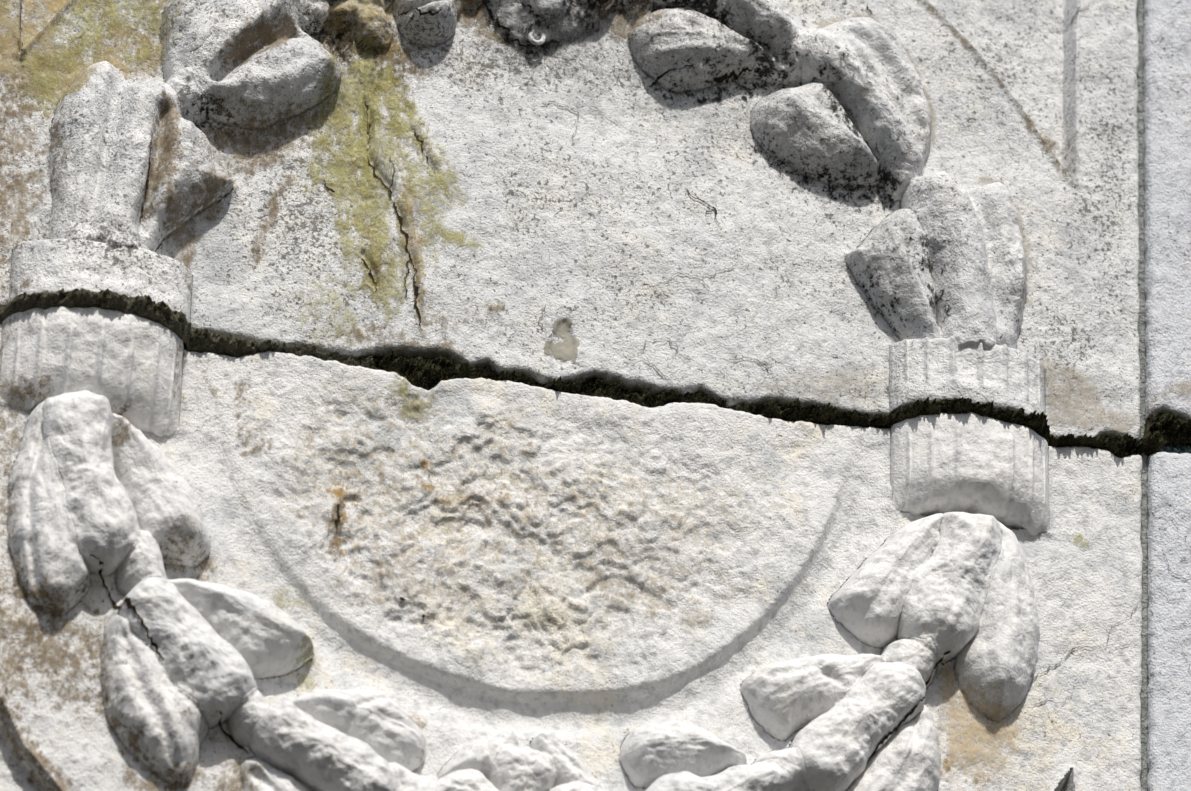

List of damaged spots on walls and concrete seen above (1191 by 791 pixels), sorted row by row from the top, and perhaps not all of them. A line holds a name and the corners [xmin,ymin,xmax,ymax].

water stain [0,0,79,264]
water stain [137,0,466,333]
crack [362,100,422,330]
crack [414,130,435,173]
crack [638,338,678,386]
crack [735,357,784,397]
crack [90,555,164,662]
crack [218,711,249,754]
crack [867,650,951,762]